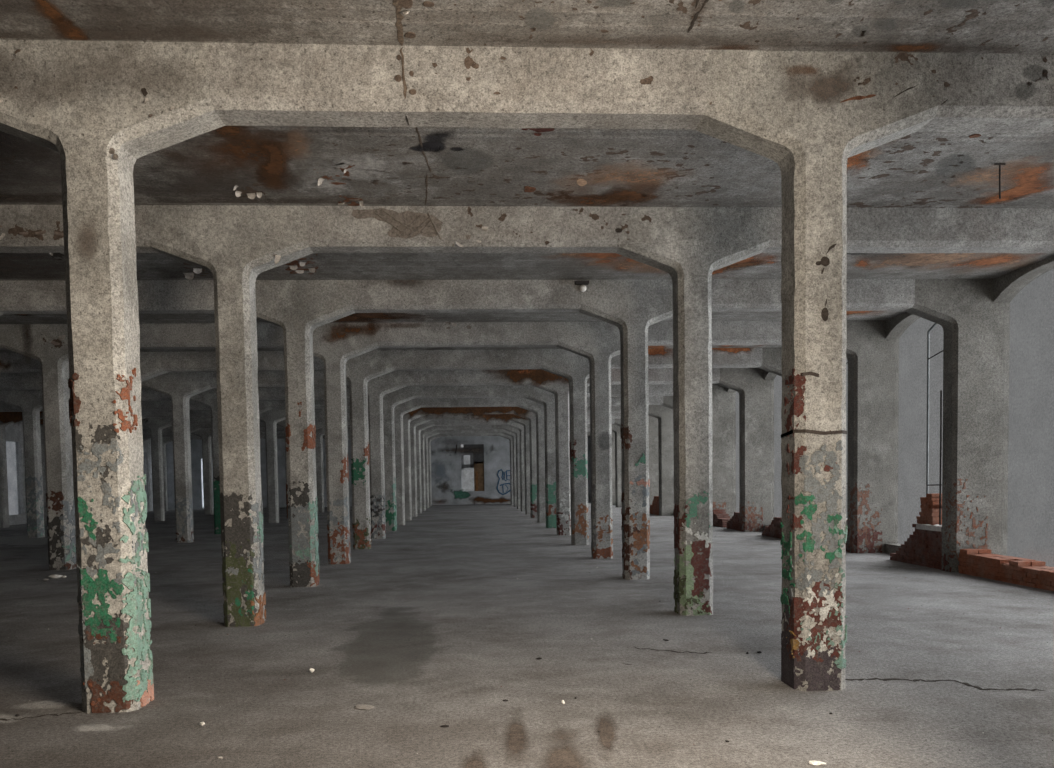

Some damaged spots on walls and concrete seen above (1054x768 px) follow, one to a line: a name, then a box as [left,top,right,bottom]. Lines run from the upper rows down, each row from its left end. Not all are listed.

rust [212,126,291,189]
crack [393,0,434,205]
rust [560,172,660,206]
rust [847,150,871,168]
rust [856,253,1020,268]
peeling [285,402,316,452]
rust [499,369,569,385]
peeling [25,368,154,713]
peeling [213,475,266,627]
peeling [286,444,397,587]
peeling [673,491,726,615]
peeling [780,368,882,691]